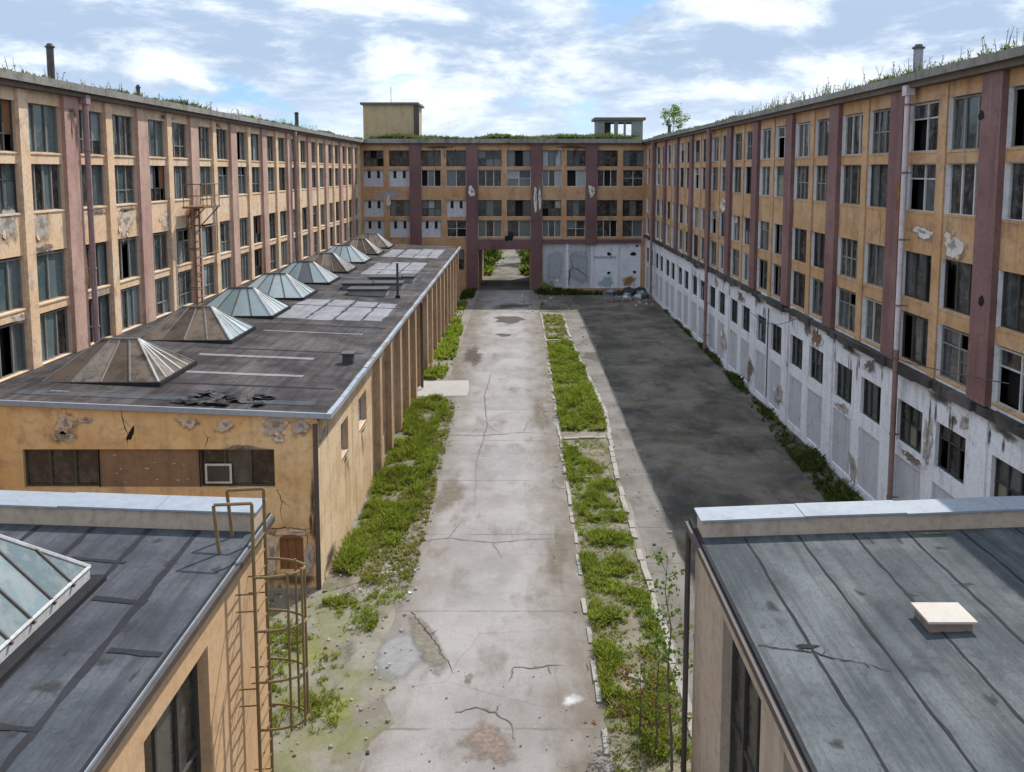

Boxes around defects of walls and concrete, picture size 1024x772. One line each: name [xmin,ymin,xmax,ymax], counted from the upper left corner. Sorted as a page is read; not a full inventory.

peeling [0,208,17,240]
peeling [118,207,134,241]
peeling [911,226,964,260]
peeling [51,409,91,443]
peeling [262,417,328,443]
crack [449,375,554,502]
crack [271,490,308,550]
crack [412,612,452,671]
crack [758,644,893,671]
crack [455,664,566,738]